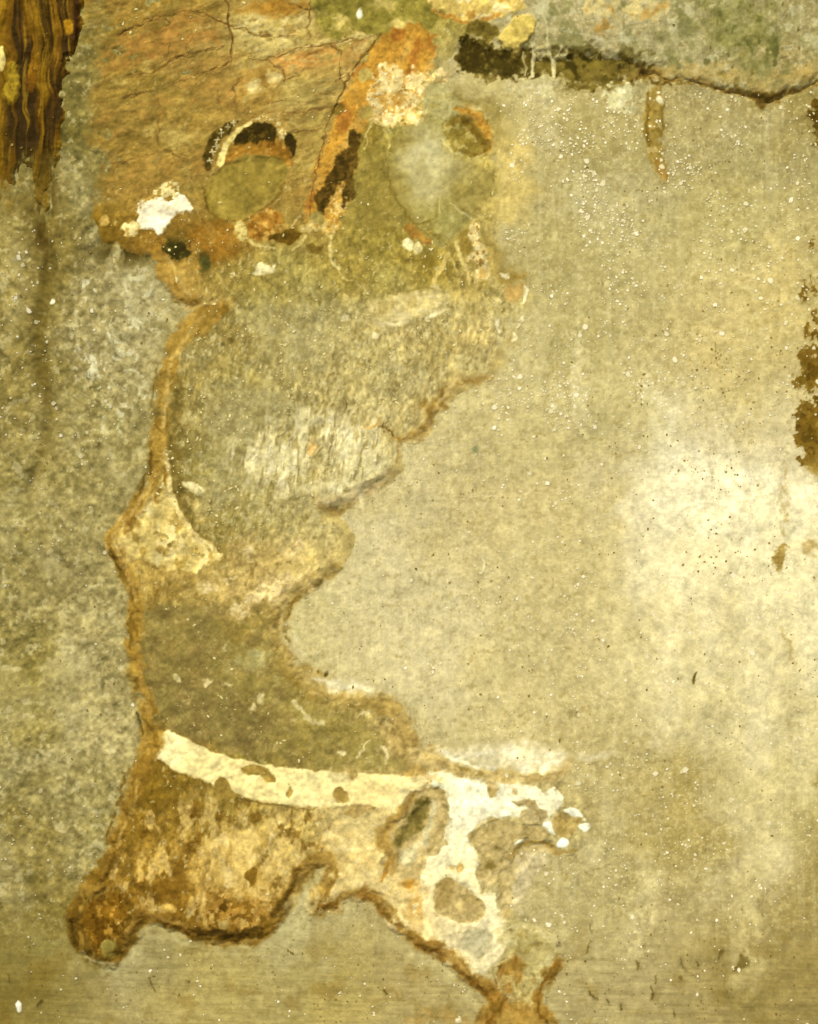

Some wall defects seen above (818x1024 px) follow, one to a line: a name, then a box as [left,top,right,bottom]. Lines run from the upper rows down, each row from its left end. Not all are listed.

crack [107,0,383,220]
spalling [462,15,501,46]
leakage [443,7,568,233]
corrosion [639,83,671,184]
crack [634,57,818,112]
spalling [62,251,586,1024]